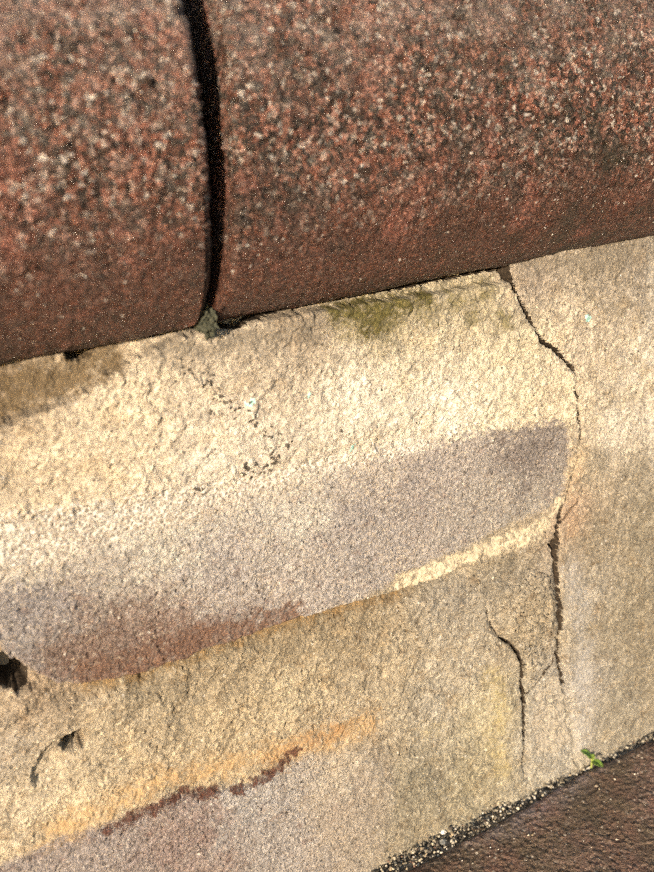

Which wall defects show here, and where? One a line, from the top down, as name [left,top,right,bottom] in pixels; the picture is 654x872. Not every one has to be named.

crack [216,265,581,446]
crack [486,469,579,759]